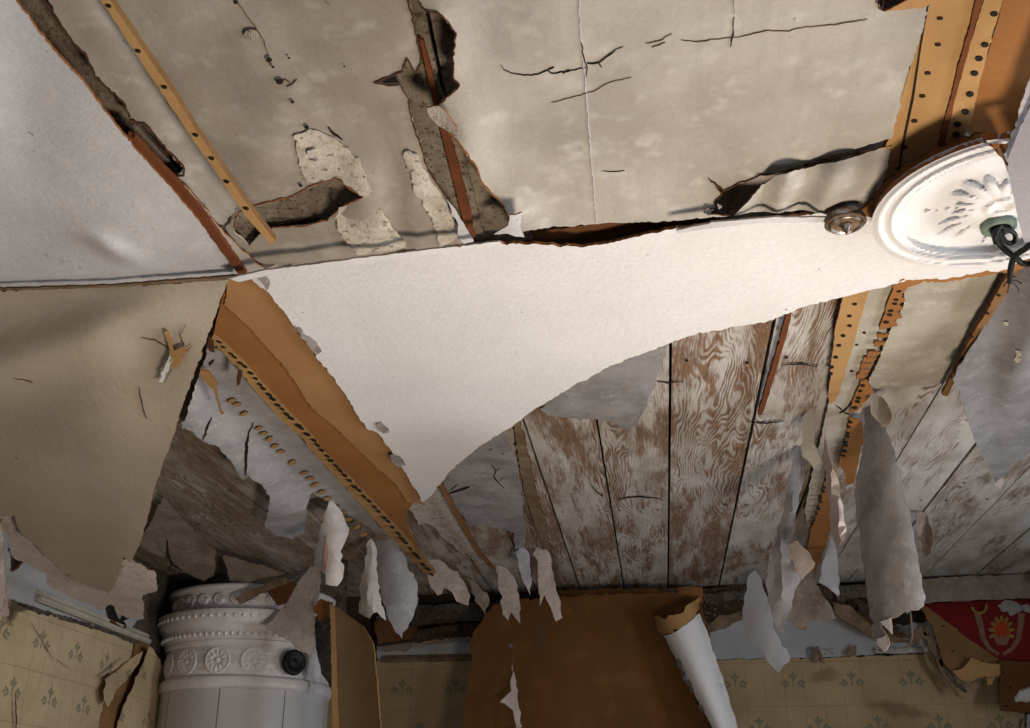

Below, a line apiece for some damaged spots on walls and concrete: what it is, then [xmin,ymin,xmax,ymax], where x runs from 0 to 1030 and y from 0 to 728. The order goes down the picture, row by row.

crack [502,3,867,217]
peeling [294,129,373,197]
peeling [336,208,407,255]
peeling [403,151,458,247]
peeling [294,326,322,356]
peeling [998,600,1030,616]